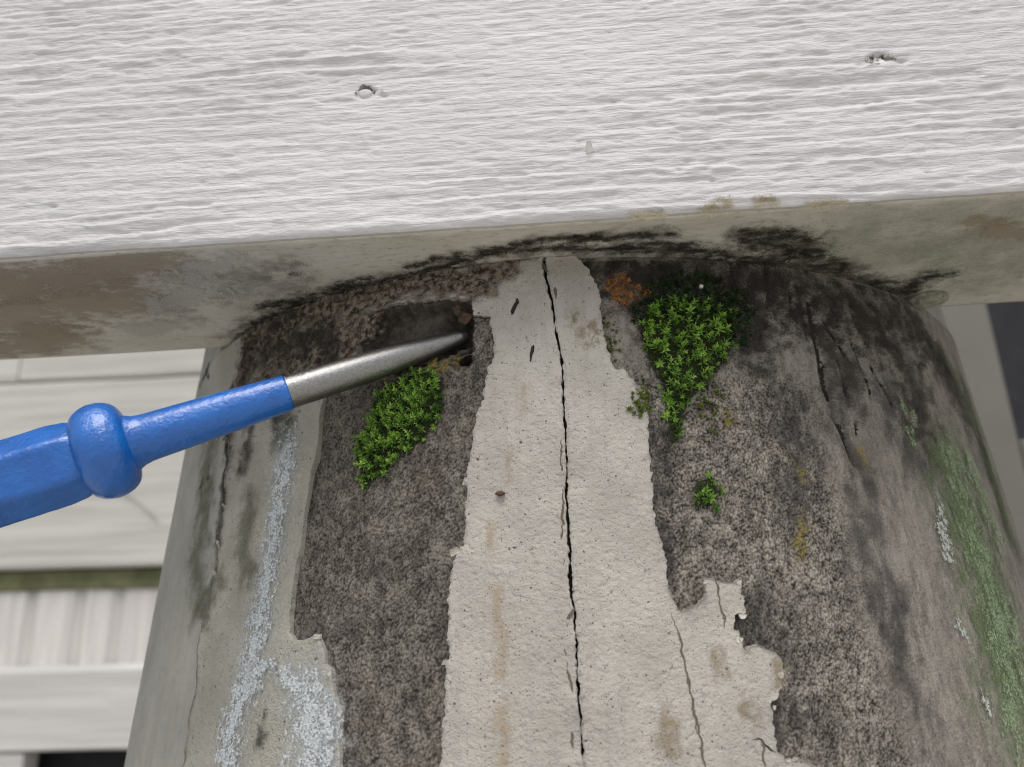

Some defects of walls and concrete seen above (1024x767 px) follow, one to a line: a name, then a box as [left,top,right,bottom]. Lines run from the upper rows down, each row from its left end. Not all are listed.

leakage [0,251,256,359]
leakage [196,414,344,767]
peeling [293,300,494,767]
crack [530,261,585,756]
leakage [228,209,1024,767]
crack [671,613,706,767]
peeling [579,257,1024,767]